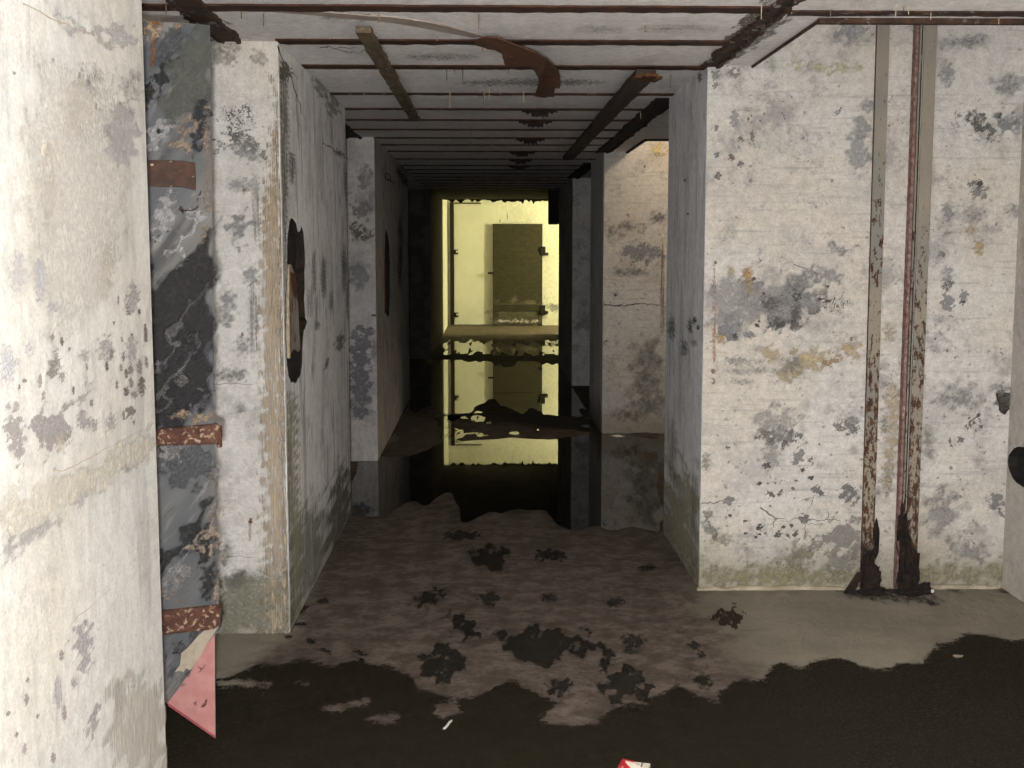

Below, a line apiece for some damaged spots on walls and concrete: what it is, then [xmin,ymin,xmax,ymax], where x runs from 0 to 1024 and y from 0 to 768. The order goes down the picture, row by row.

spalling [285,218,307,383]
crack [701,496,840,540]